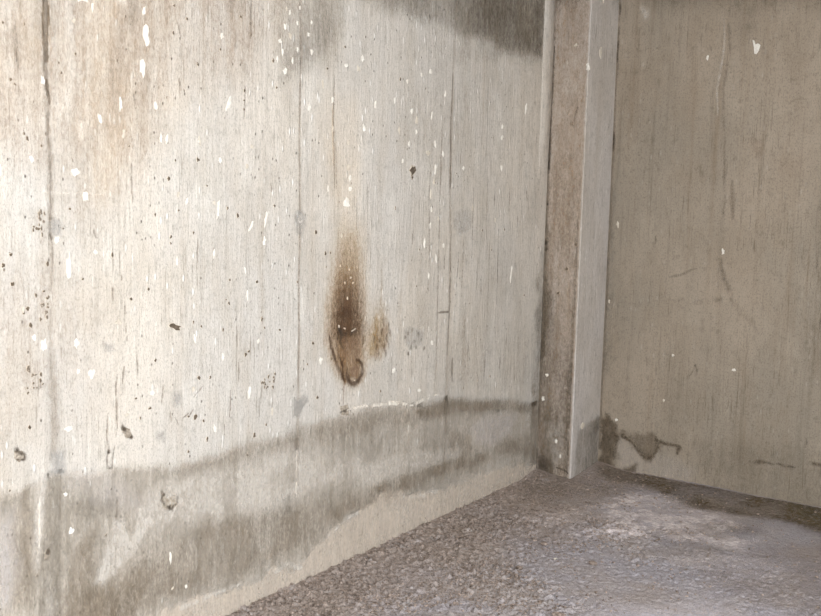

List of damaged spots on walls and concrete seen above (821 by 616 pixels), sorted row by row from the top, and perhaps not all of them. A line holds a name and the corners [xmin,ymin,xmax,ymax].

water stain [0,0,588,616]
rust [329,265,363,385]
water stain [585,414,821,547]